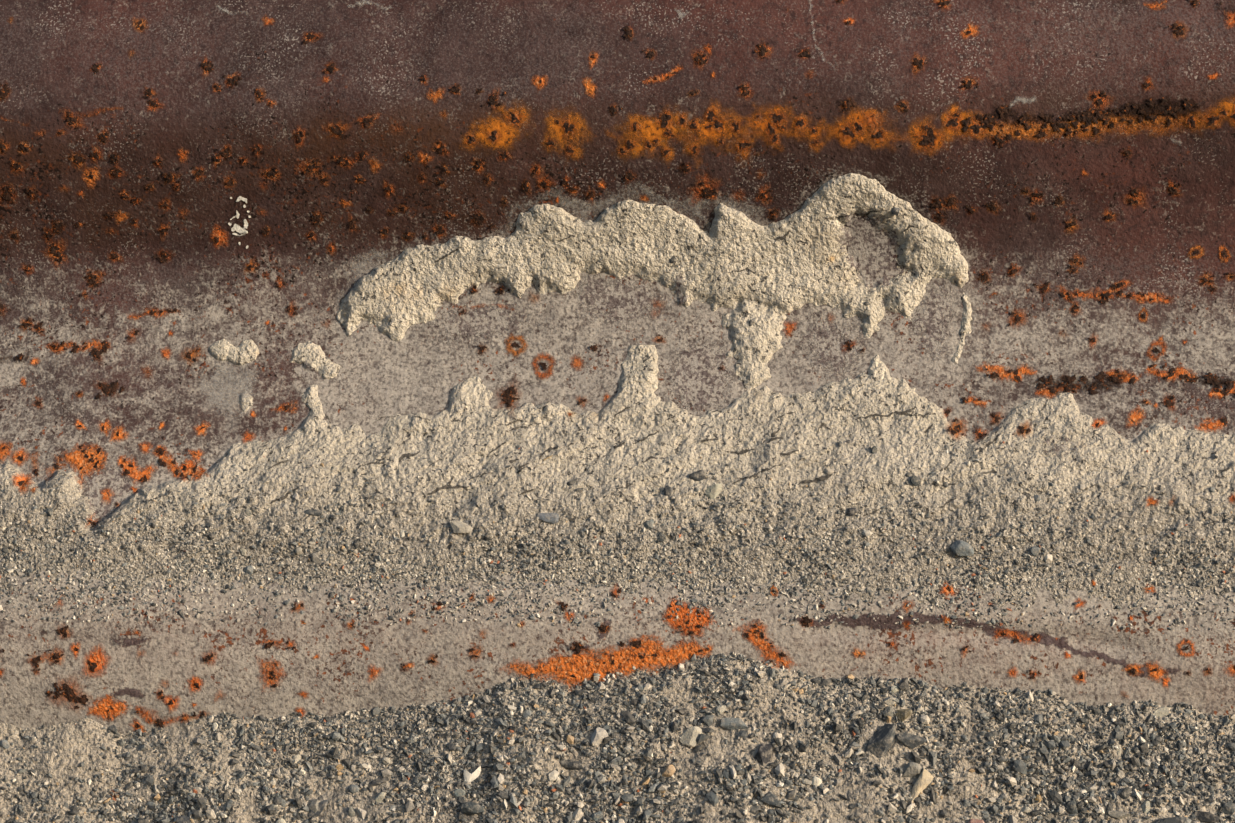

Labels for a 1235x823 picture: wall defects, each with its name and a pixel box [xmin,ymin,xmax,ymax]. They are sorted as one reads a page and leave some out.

corrosion [911,91,1235,150]
corrosion [609,105,819,200]
corrosion [501,386,520,407]
corrosion [506,335,555,379]
corrosion [976,365,1035,382]
corrosion [1103,336,1197,426]
corrosion [0,420,207,493]
corrosion [26,626,107,674]
corrosion [262,640,296,688]
corrosion [500,599,712,687]
corrosion [738,622,792,667]
corrosion [46,677,209,732]